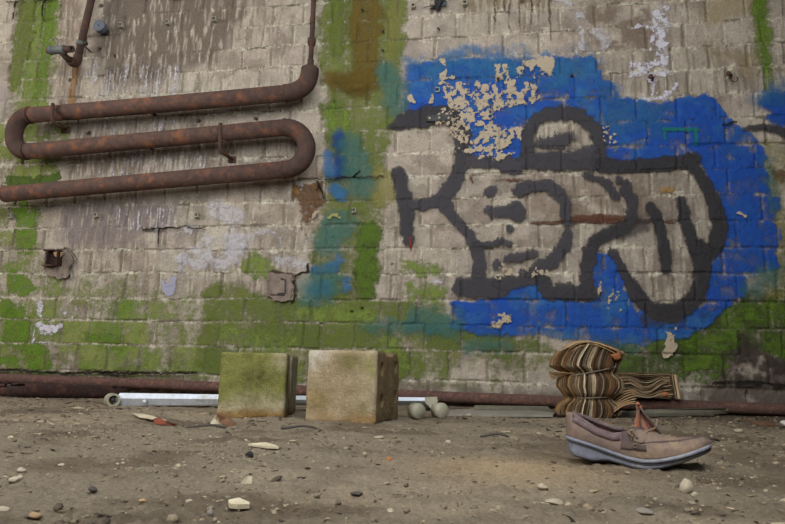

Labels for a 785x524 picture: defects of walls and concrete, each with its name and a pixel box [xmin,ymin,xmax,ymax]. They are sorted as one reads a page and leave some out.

leakage [324,0,398,100]
peeling [428,55,555,161]
corrosion [291,181,326,235]
leakage [31,301,77,343]
leakage [719,334,785,390]